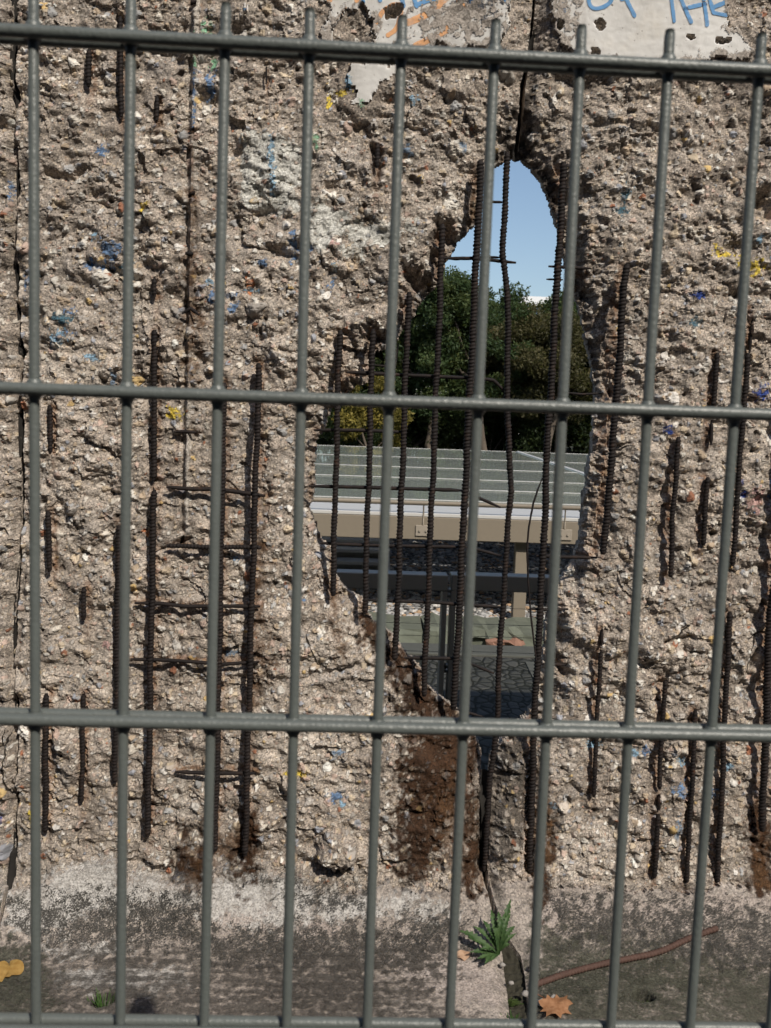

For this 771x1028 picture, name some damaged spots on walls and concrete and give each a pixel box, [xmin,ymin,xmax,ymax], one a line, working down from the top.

crack [10,0,21,109]
spalling [0,0,607,55]
spalling [681,0,771,64]
spalling [0,45,771,725]
crack [18,406,26,527]
rust [335,604,459,717]
crack [1,730,20,922]
spalling [0,725,771,895]
rust [381,734,488,911]
damp [472,737,530,875]
rust [743,799,771,898]
damp [0,847,503,1018]